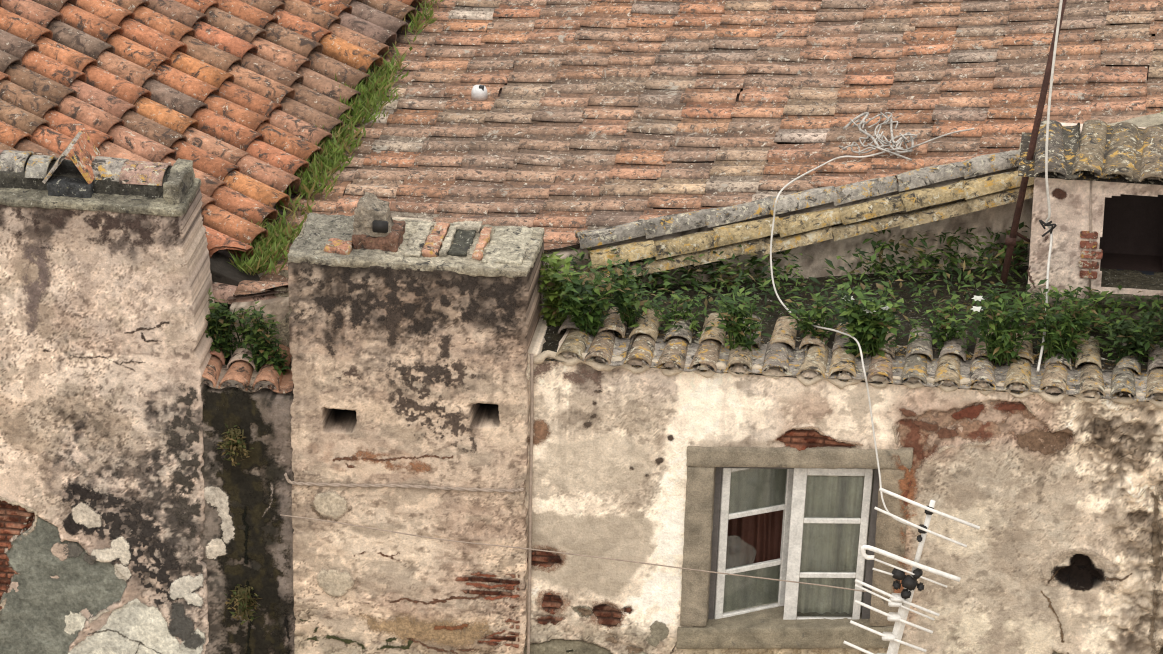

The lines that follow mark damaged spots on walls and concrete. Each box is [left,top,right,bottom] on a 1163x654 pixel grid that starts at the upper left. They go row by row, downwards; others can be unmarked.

damp [0,204,159,335]
crack [43,322,169,371]
damp [334,365,361,386]
crack [333,455,453,468]
damp [386,360,483,453]
flaking render [776,426,863,451]
flaking render [892,400,1075,473]
flaking render [0,497,132,654]
damp [62,383,293,654]
peeling [204,486,235,561]
flaking render [455,546,669,654]
damp [1148,474,1163,654]